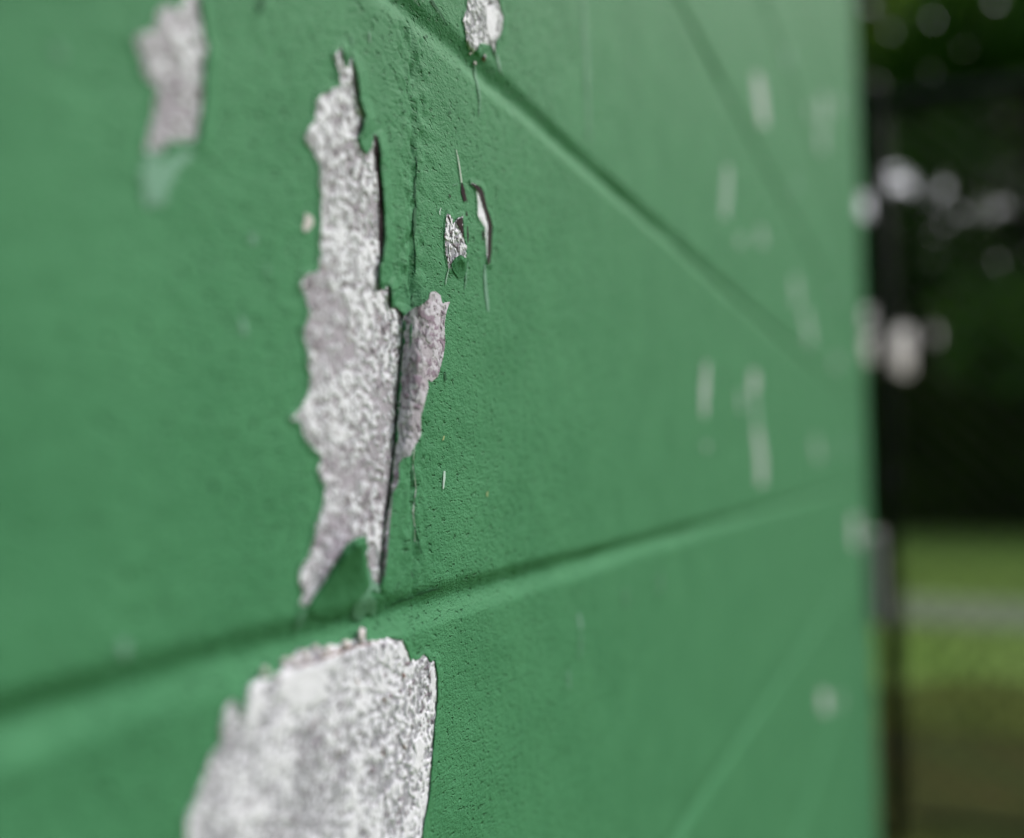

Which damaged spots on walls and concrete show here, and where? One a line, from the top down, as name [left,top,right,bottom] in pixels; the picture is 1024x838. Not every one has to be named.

peeling [127,0,221,162]
peeling [461,0,507,60]
peeling [443,178,496,274]
peeling [286,39,450,617]
peeling [181,617,444,838]